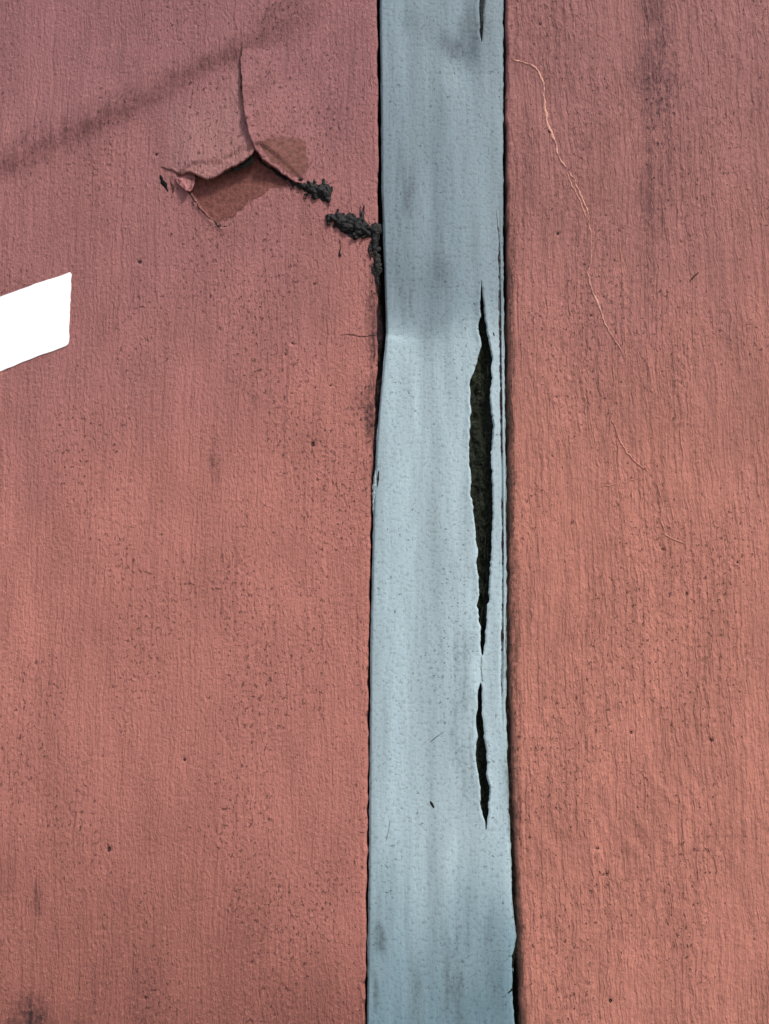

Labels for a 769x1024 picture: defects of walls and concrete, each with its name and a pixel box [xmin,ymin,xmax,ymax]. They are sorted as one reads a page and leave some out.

peeling [159,48,343,227]
crack [495,210,503,464]
crack [510,58,627,366]
crack [498,498,506,697]